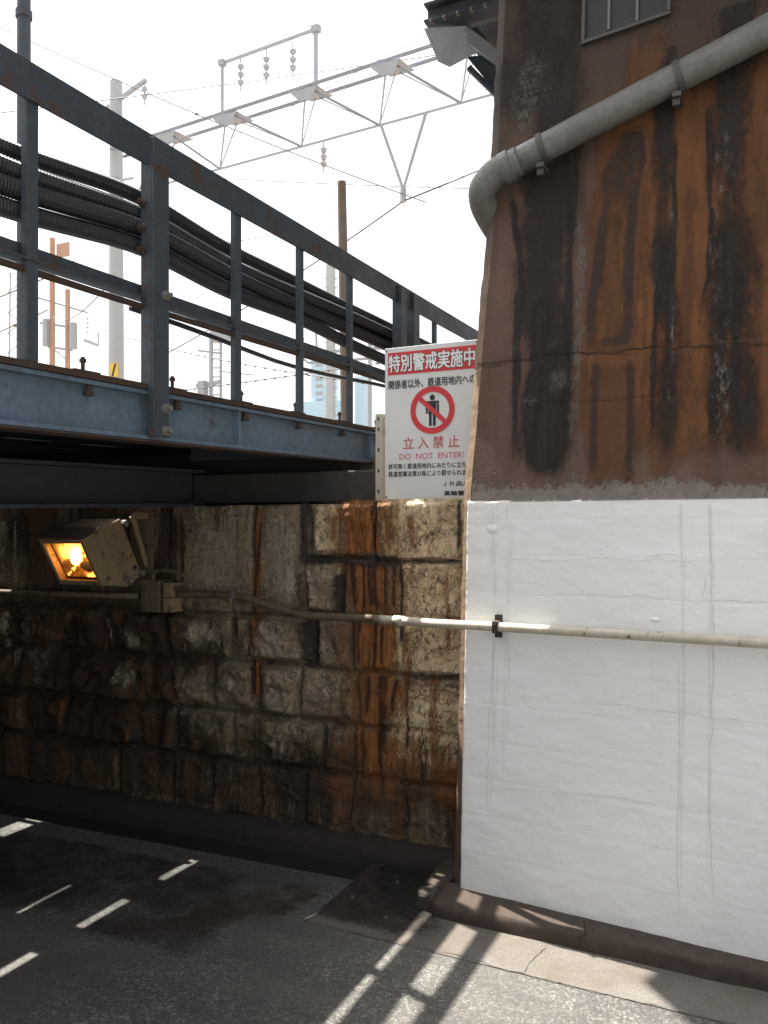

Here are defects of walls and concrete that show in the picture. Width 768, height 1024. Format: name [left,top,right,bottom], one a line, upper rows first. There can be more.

damp [496,0,584,134]
corrosion [626,28,668,85]
damp [718,0,756,37]
damp [511,144,583,474]
crack [473,342,768,368]
damp [650,100,679,449]
corrosion [573,55,768,484]
damp [701,56,759,451]
corrosion [248,509,263,700]
corrosion [325,500,458,808]